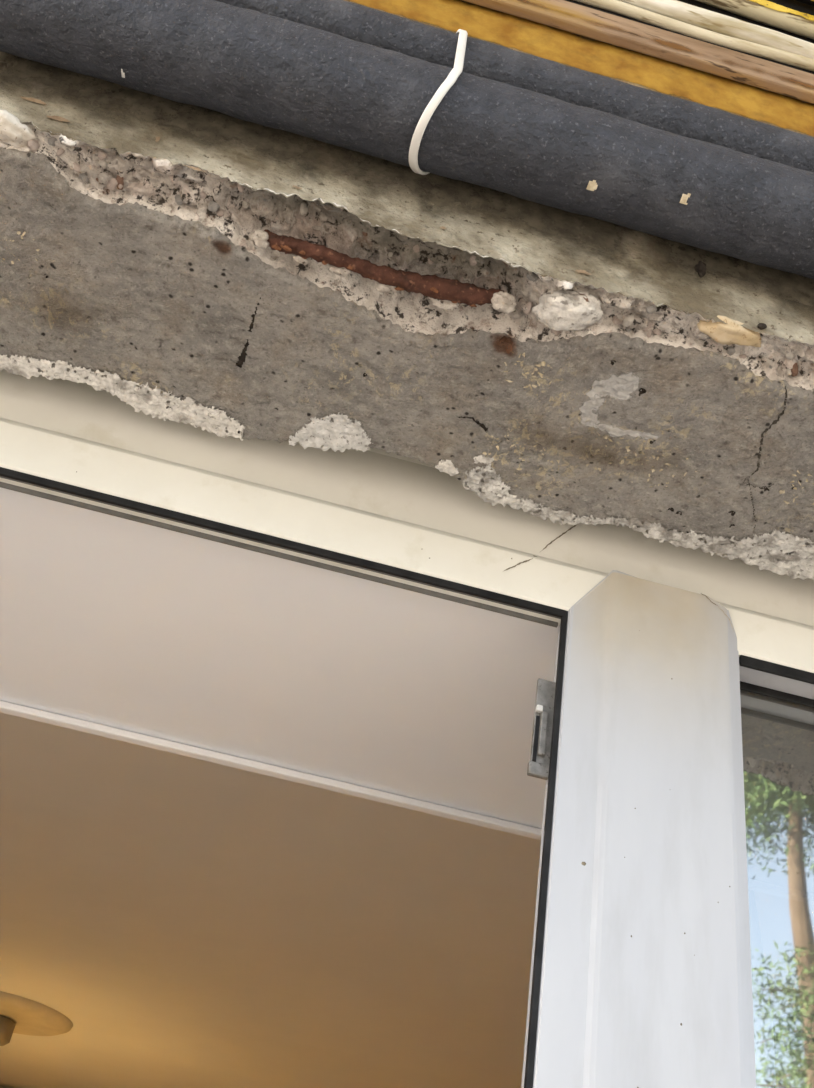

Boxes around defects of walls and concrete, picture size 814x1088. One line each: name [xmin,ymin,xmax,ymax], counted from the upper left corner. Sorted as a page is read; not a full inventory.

spalling [0,96,814,393]
peeling [0,354,245,441]
peeling [289,412,373,452]
crack [504,525,576,571]
peeling [435,416,814,580]
peeling [580,360,697,487]
crack [740,386,787,532]